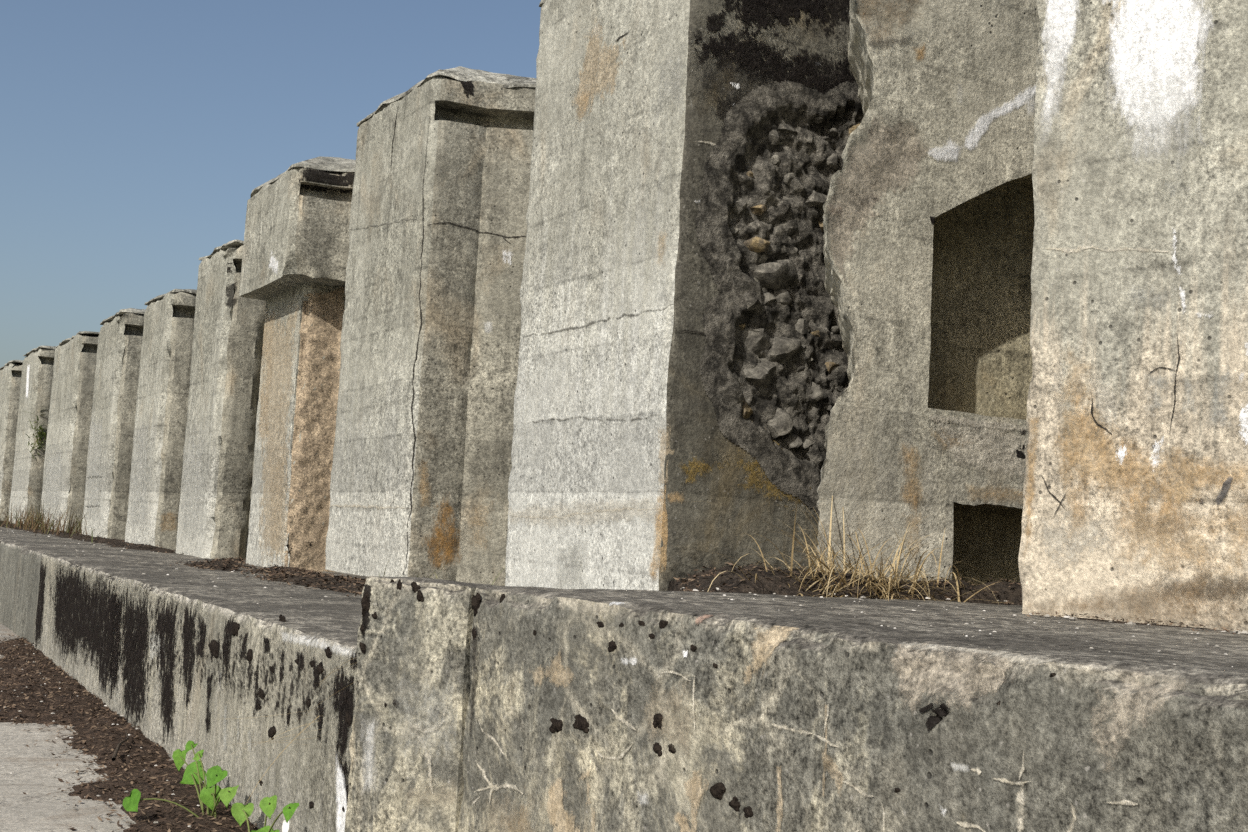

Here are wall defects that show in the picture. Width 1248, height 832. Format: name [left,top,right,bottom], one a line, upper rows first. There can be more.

damp [929,0,1078,160]
damp [1103,0,1211,151]
spalling [691,0,928,515]
crack [330,118,526,573]
crack [1148,339,1180,433]
damp [108,582,124,704]
damp [205,615,251,750]
damp [263,636,322,743]